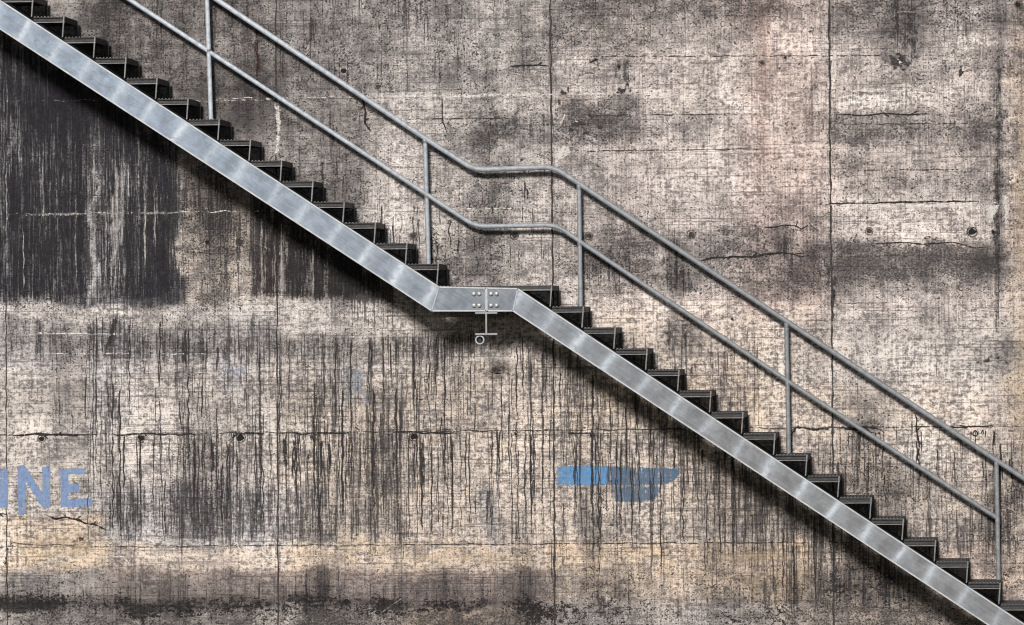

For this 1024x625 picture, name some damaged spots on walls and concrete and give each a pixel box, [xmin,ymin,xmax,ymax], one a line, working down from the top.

crack [840,109,932,117]
leakage [0,35,187,303]
crack [819,198,977,206]
crack [700,222,810,261]
leakage [69,316,900,607]
leakage [915,430,942,511]
leakage [975,432,1022,504]
crack [6,514,105,567]
leakage [0,581,330,614]